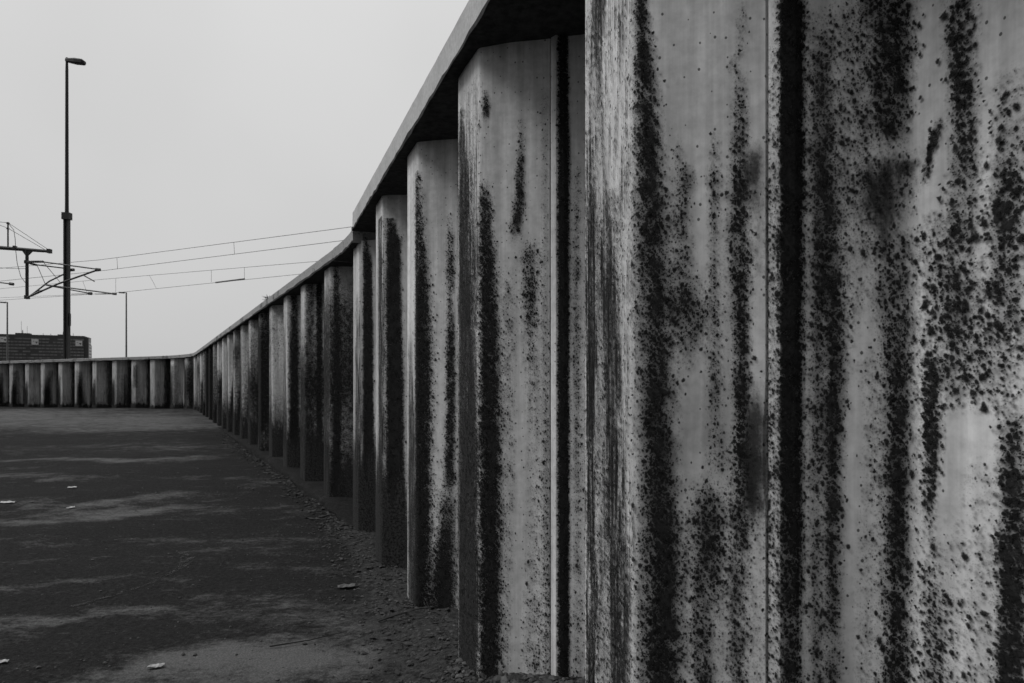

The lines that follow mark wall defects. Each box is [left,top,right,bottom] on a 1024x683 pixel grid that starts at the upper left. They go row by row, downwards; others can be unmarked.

damp [742,141,766,205]
damp [855,146,915,245]